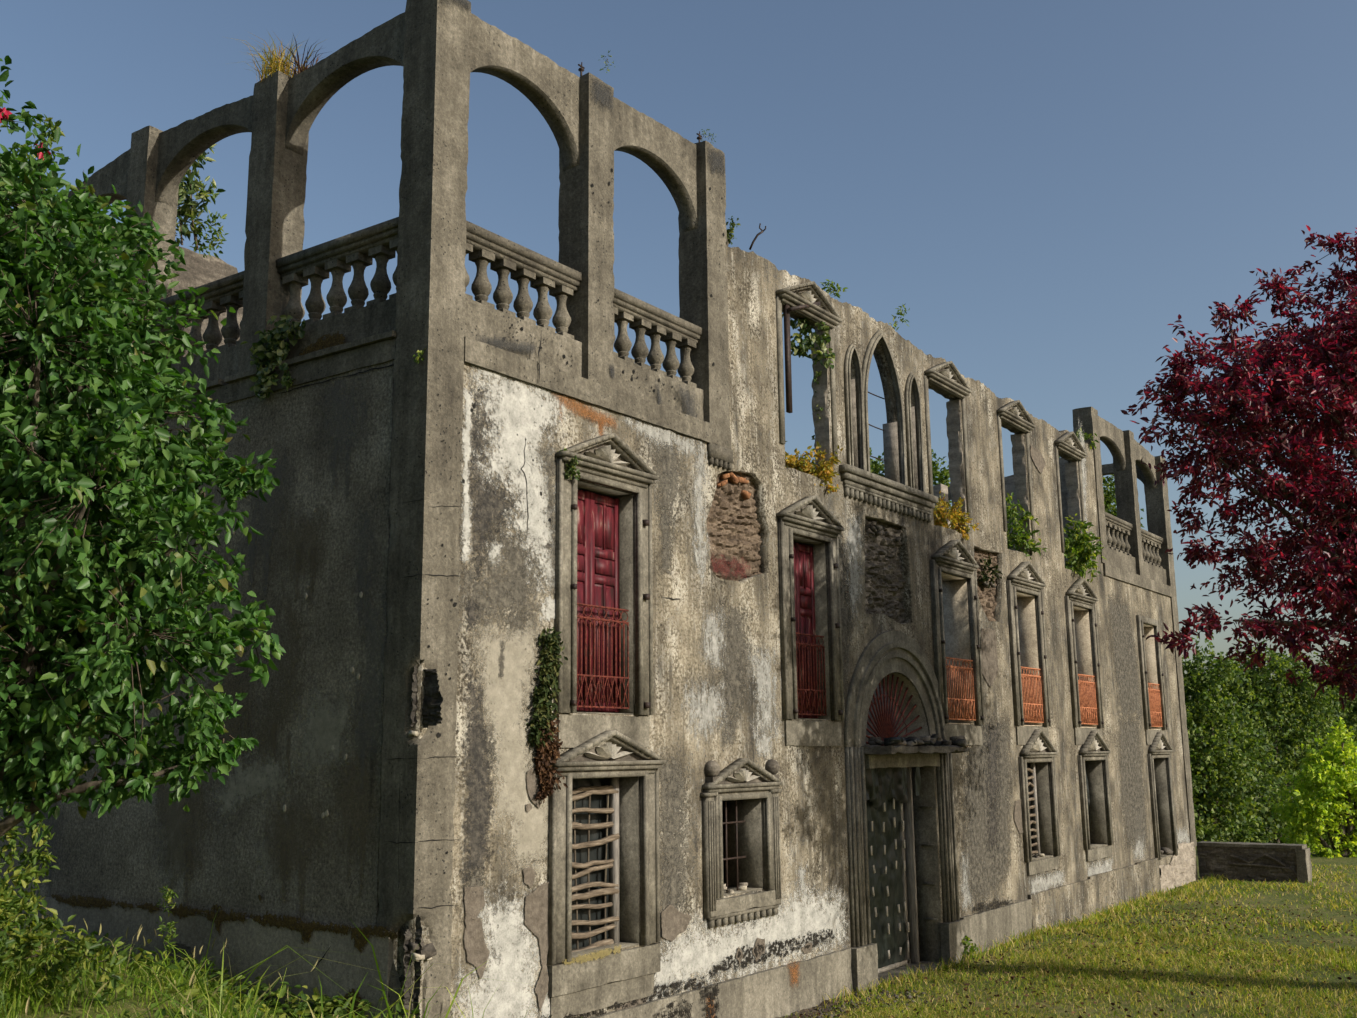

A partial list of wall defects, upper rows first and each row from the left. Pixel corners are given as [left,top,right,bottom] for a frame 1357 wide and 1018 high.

spalling [717,472,751,500]
water stain [208,457,328,792]
water stain [459,375,556,892]
flaking render [464,886,490,979]
flaking render [523,867,550,1018]